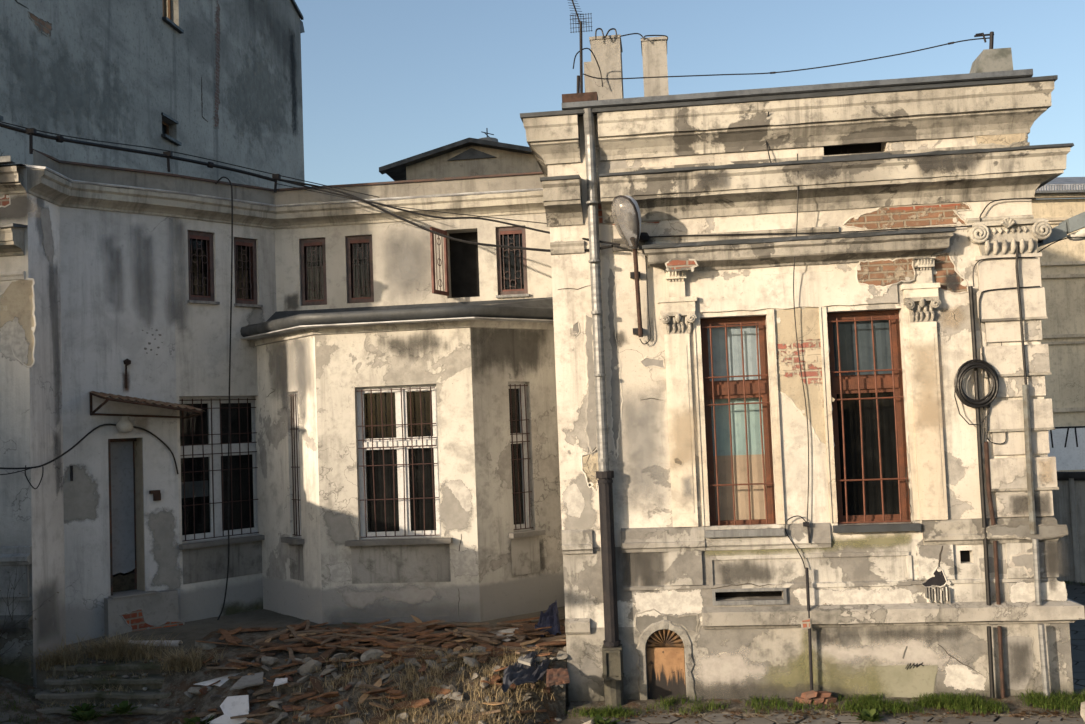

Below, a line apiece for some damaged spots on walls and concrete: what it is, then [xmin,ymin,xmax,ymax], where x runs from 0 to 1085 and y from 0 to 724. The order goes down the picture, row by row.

flaking render [27,10,53,39]
flaking render [843,202,972,232]
flaking render [855,257,916,292]
flaking render [931,251,969,294]
flaking render [0,278,37,368]
flaking render [774,306,835,447]
flaking render [943,664,987,691]